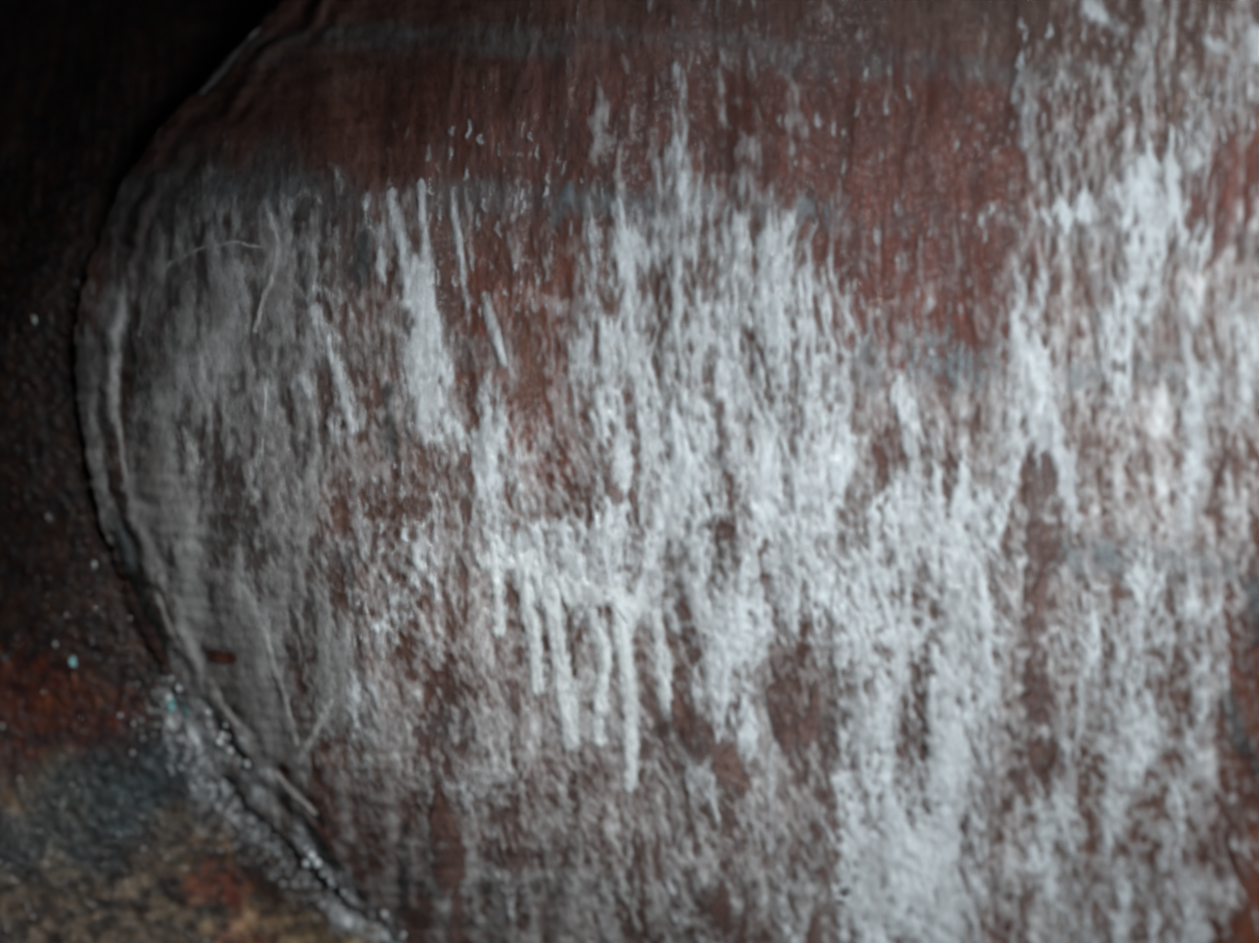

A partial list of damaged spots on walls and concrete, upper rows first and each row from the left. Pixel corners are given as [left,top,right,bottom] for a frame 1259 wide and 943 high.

damp [73,199,444,843]
damp [355,18,1259,943]